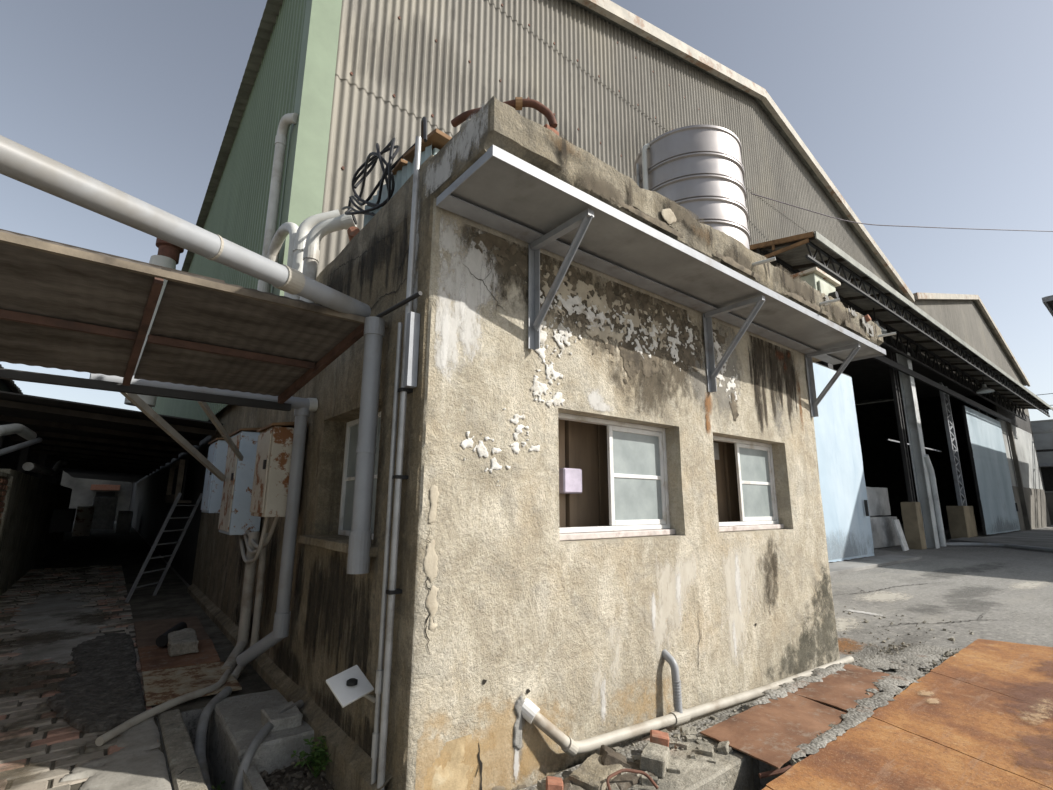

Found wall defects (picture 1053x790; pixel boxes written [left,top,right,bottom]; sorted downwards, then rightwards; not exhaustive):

spalling [462,227,740,421]
water stain [748,335,803,430]
peeling [461,408,540,486]
crack [425,577,435,663]